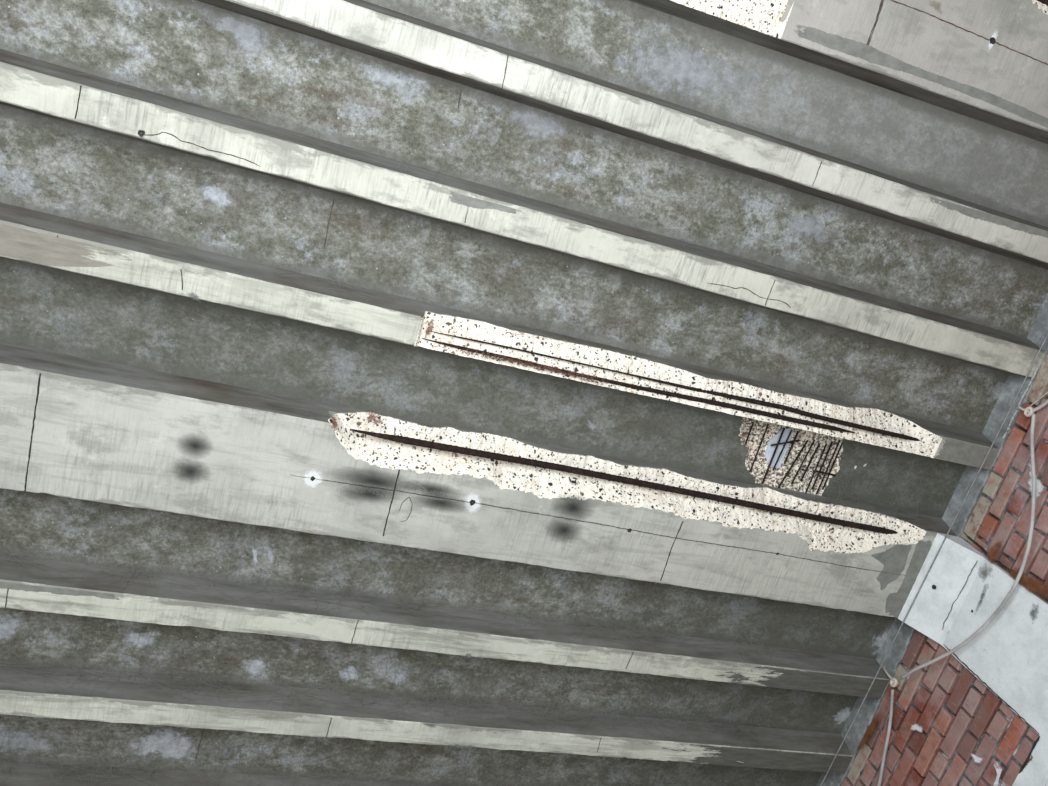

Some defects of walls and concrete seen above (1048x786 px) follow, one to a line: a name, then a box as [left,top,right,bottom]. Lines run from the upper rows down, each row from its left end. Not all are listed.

spalling [670,0,794,39]
spalling [1032,0,1048,15]
crack [144,132,261,167]
crack [707,283,791,308]
spalling [328,312,943,554]